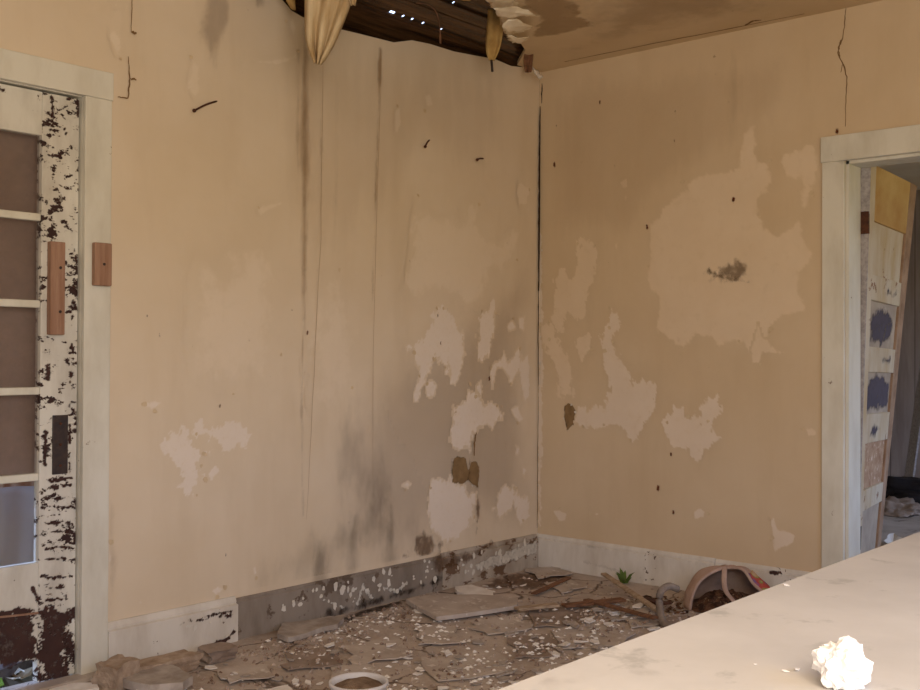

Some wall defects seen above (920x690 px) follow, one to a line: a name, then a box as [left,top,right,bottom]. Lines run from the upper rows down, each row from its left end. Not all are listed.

peeling [486,0,541,44]
crack [837,10,847,126]
peeling [547,235,598,341]
peeling [644,121,820,362]
peeling [158,416,256,499]
peeling [398,295,531,544]
peeling [563,305,725,464]
peeling [281,559,437,611]
peeling [457,539,538,576]